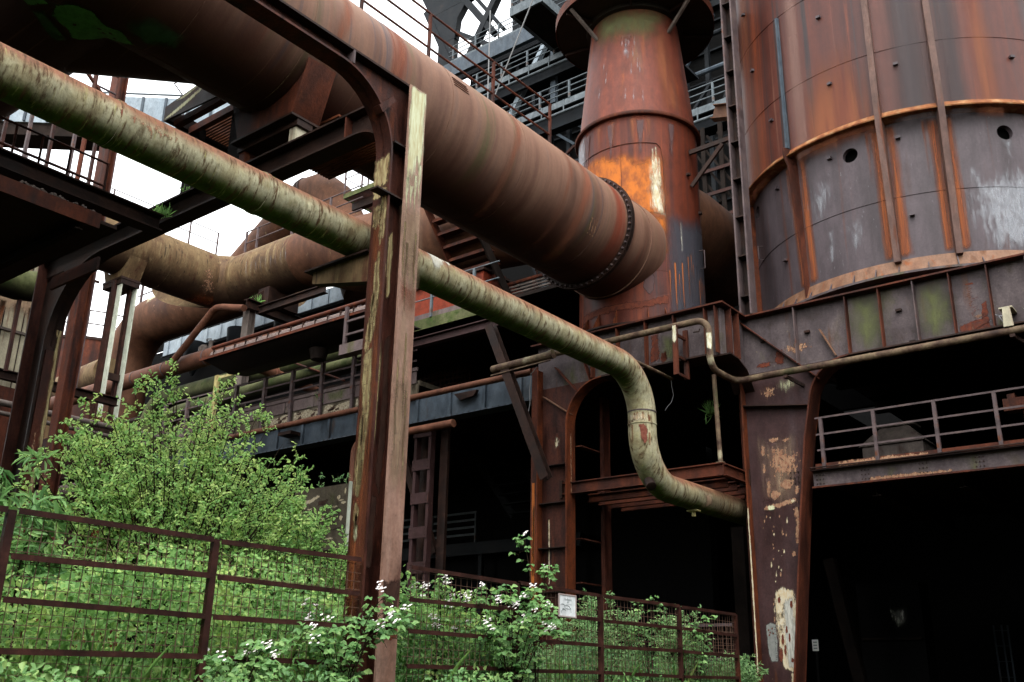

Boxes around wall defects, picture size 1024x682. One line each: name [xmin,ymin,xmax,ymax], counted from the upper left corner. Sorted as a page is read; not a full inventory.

corrosion [545,120,674,261]
corrosion [865,128,910,259]
corrosion [922,117,970,250]
water stain [985,181,1024,242]
corrosion [670,261,705,309]
peeling [764,498,799,682]